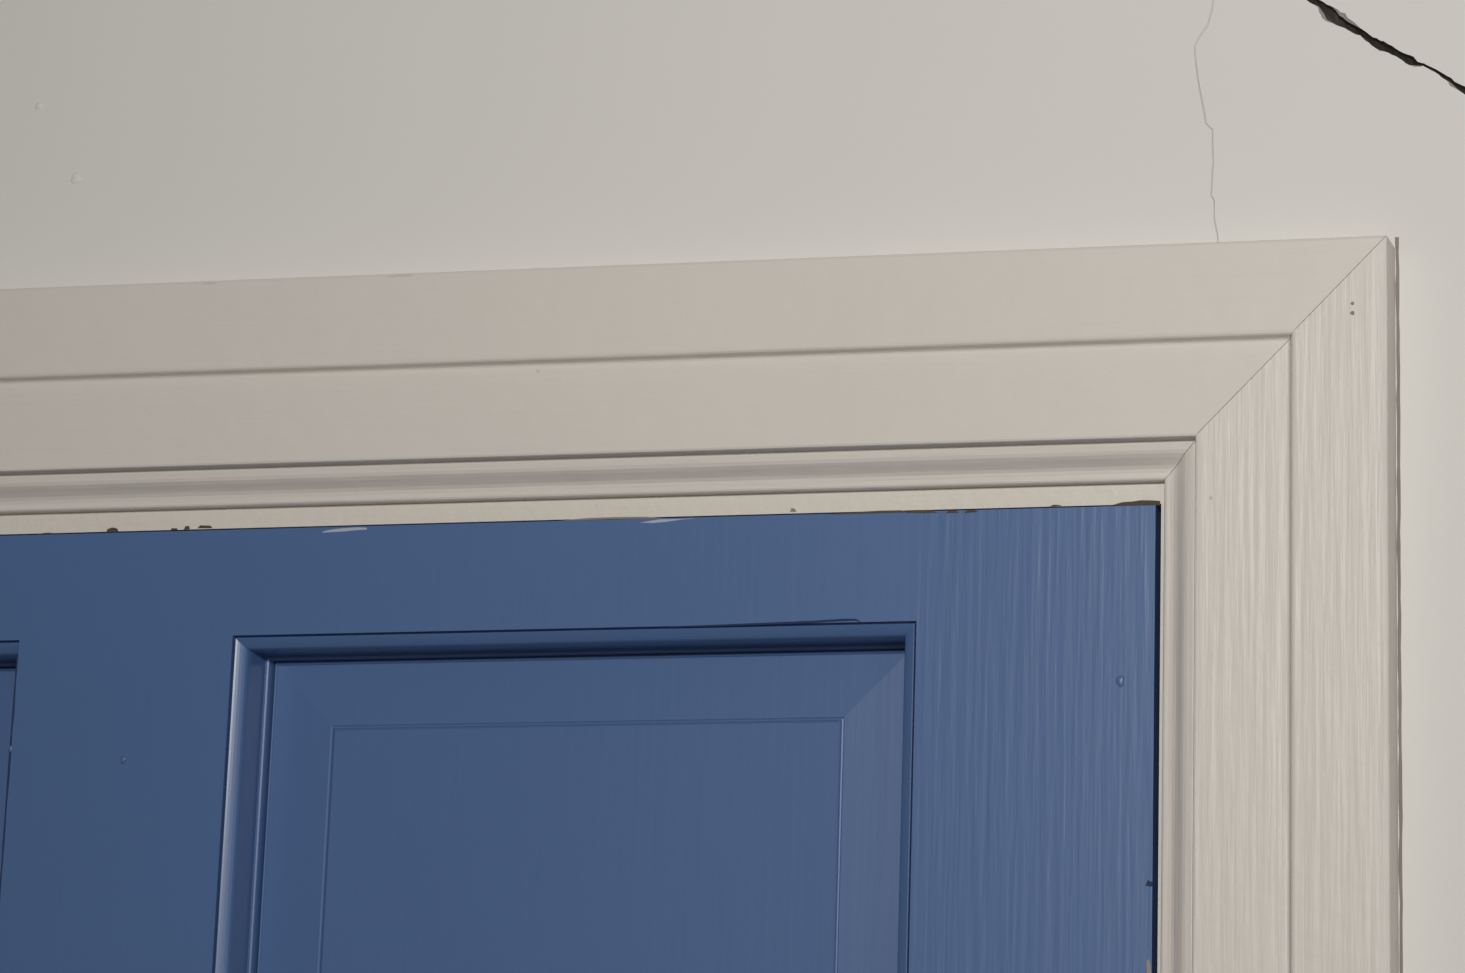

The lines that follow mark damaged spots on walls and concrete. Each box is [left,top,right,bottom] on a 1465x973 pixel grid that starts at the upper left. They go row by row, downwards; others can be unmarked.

crack [1194,0,1219,242]
crack [1307,0,1465,94]